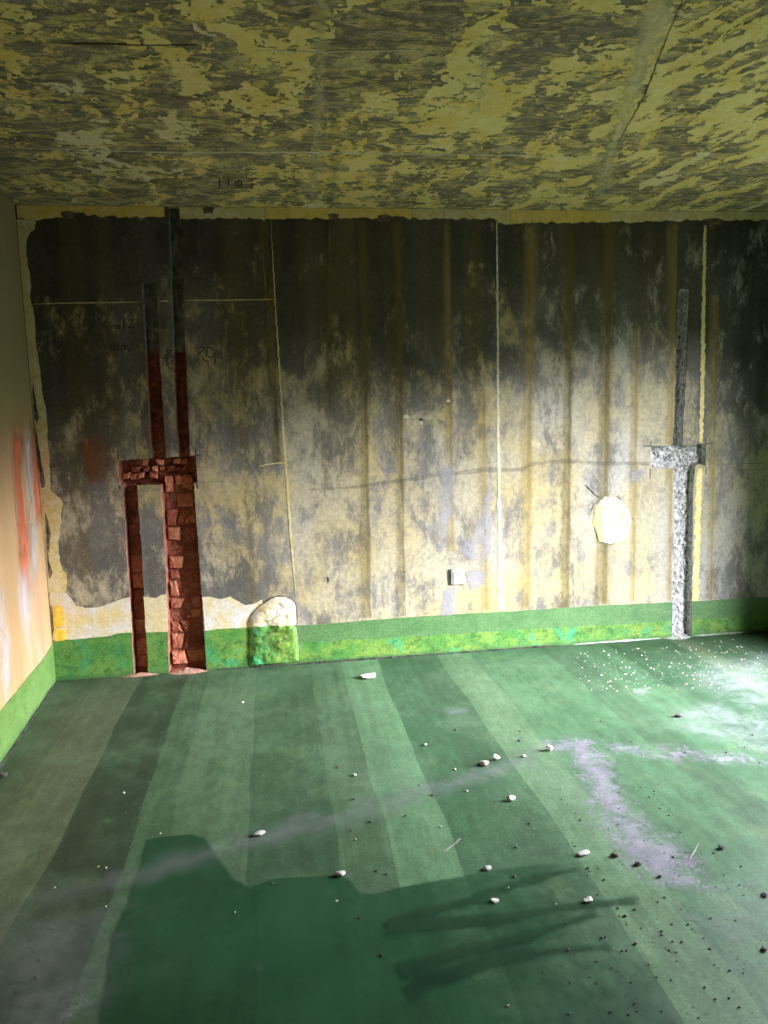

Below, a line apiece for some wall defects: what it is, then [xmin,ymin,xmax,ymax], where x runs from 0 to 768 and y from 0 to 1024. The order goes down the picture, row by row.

crack [0,0,683,198]
peeling [0,0,768,641]